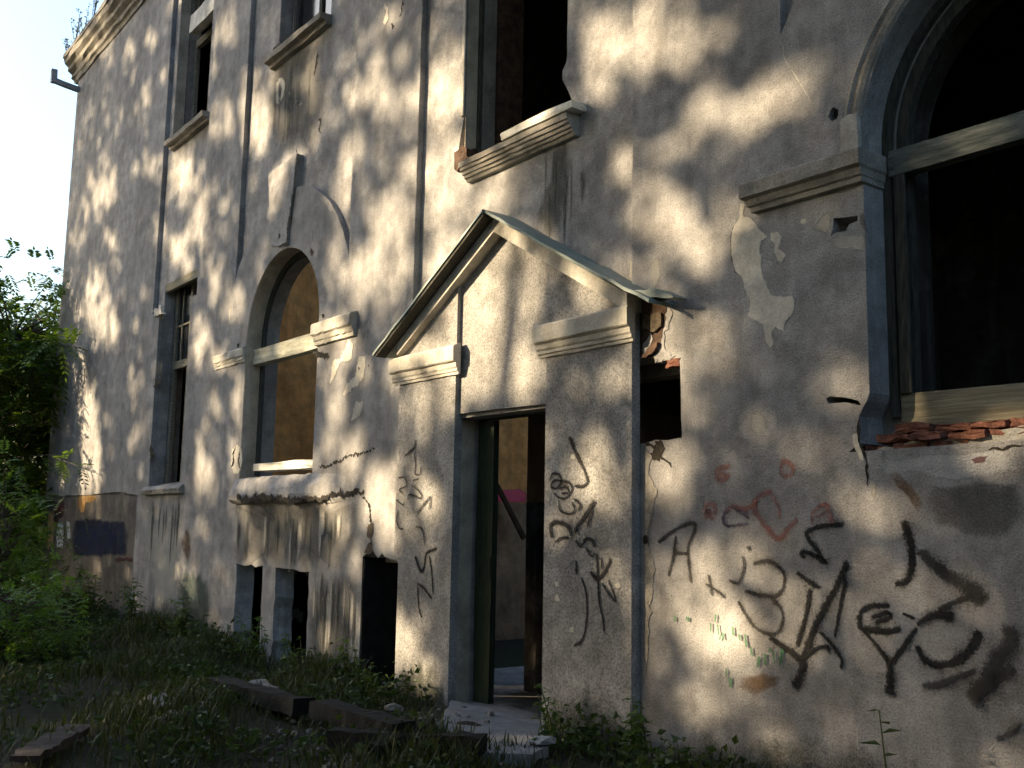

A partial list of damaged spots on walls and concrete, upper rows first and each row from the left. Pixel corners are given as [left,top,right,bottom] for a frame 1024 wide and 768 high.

flaking render [730,203,795,347]
flaking render [329,339,369,421]
spalling [640,299,681,369]
crack [236,447,375,555]
crack [852,417,876,495]
damp [234,507,356,667]